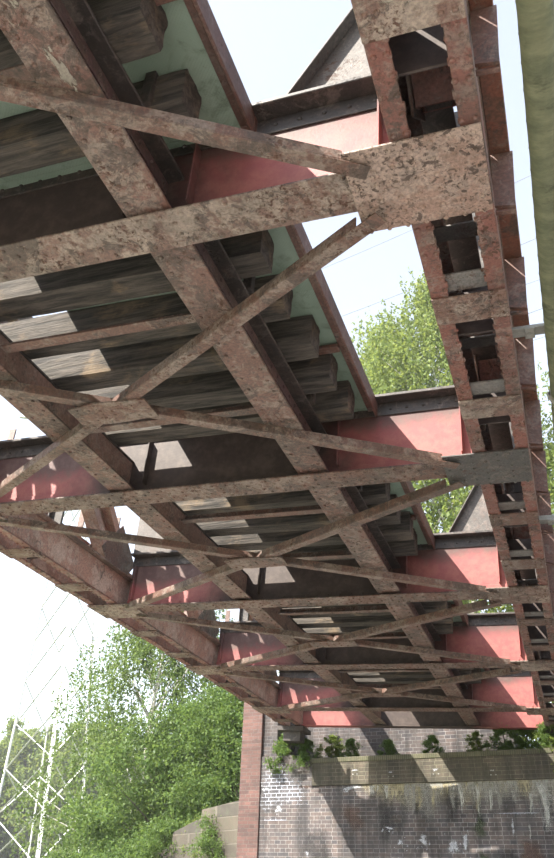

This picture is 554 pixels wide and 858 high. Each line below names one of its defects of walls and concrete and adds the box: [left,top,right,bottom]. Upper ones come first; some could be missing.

water stain [371,779,554,833]